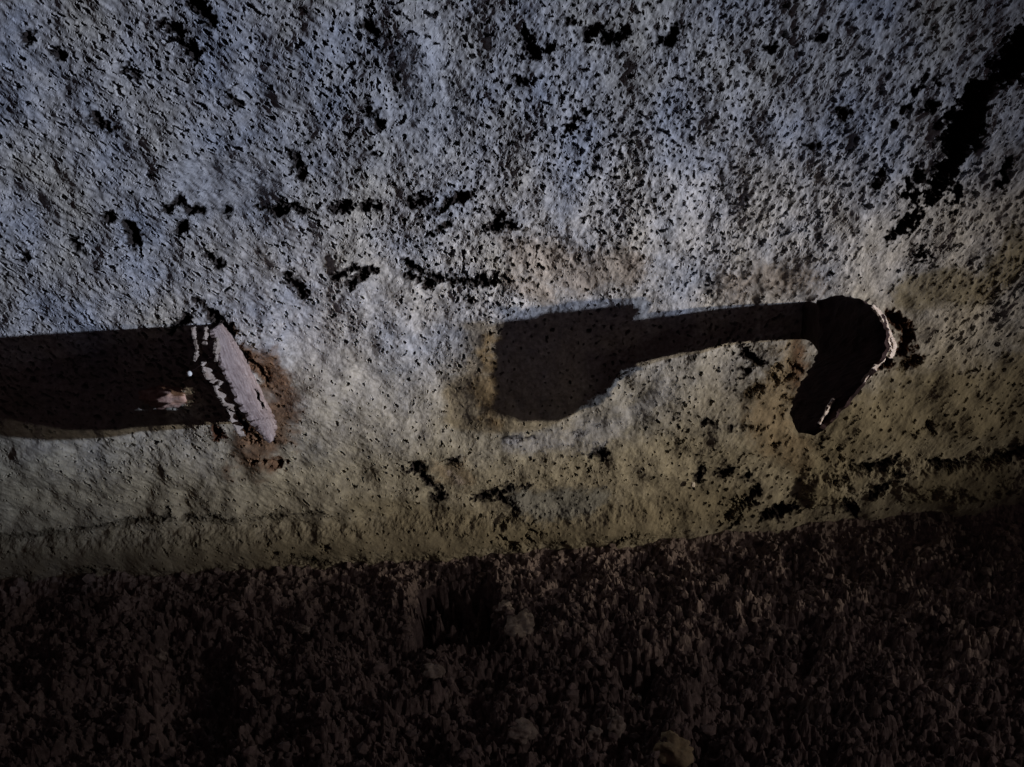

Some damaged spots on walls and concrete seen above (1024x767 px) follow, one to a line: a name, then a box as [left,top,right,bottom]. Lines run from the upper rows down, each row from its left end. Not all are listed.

rust [190,326,300,472]